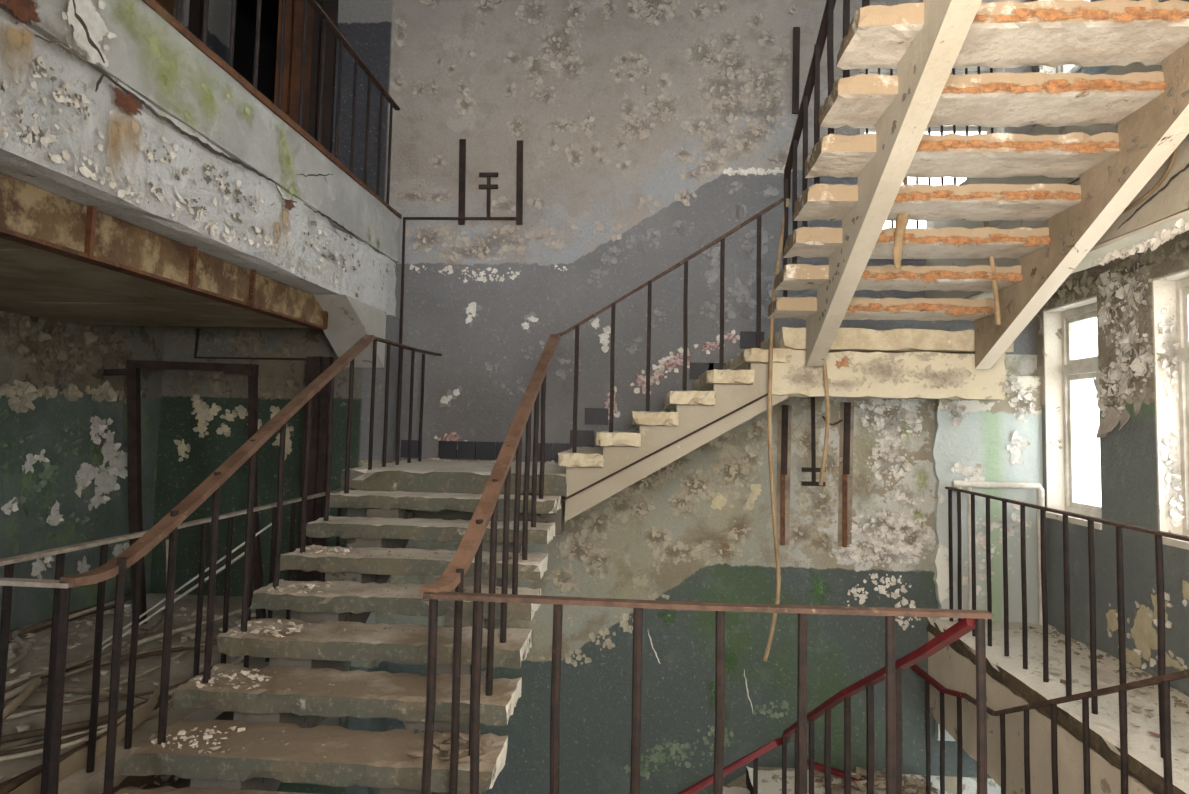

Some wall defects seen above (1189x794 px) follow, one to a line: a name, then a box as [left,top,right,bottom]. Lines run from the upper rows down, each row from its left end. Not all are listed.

spalling [61,0,117,69]
corrosion [973,7,1189,22]
corrosion [942,79,1166,94]
corrosion [917,140,1119,153]
peeling [547,0,793,420]
corrosion [877,232,1050,247]
corrosion [894,190,1083,202]
crack [1118,163,1189,230]
peeling [1046,217,1189,438]
spalling [174,394,294,462]
spalling [75,415,128,511]
spalling [1106,580,1189,671]